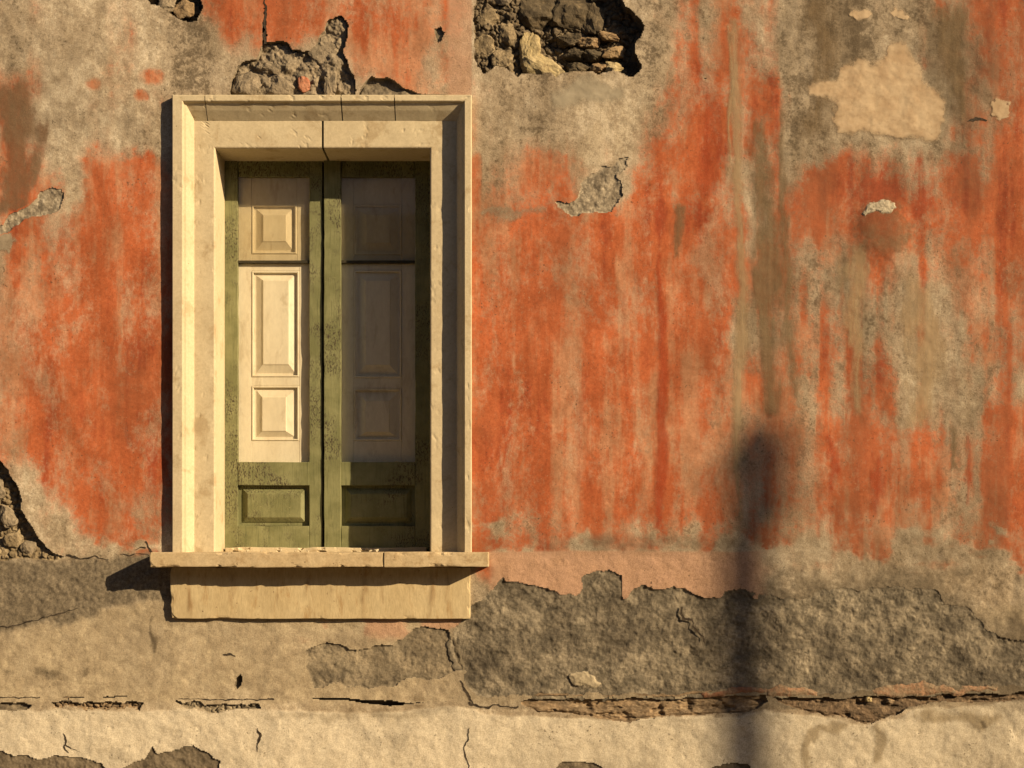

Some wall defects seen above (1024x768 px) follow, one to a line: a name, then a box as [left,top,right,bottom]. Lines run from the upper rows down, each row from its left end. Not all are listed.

spalling [229,8,445,97]
spalling [473,0,645,77]
peeling [555,157,629,217]
leakage [728,21,791,493]
spalling [0,461,64,561]
peeling [305,569,1024,724]
peeling [0,751,105,768]
crack [0,694,127,702]
peeling [124,745,220,768]
crack [179,695,274,703]
crack [313,698,424,707]
crack [460,680,519,768]